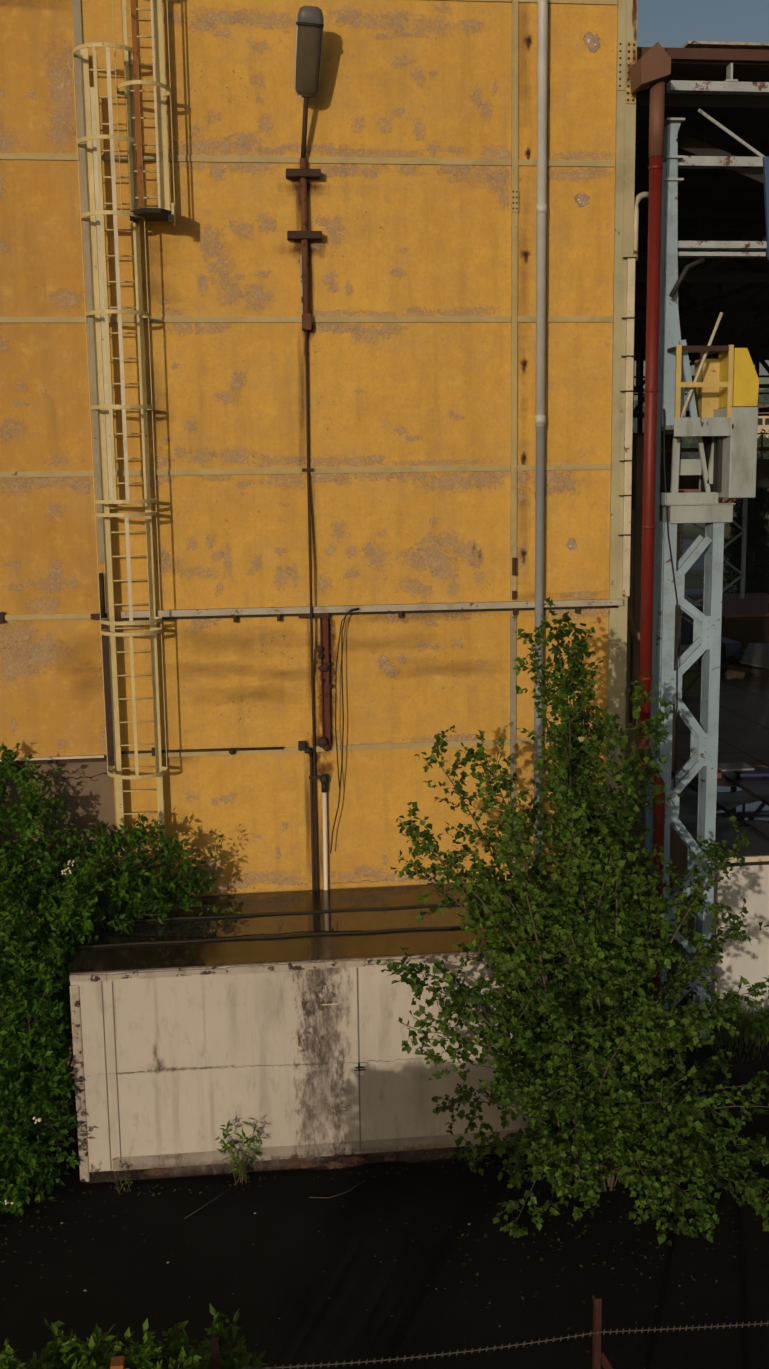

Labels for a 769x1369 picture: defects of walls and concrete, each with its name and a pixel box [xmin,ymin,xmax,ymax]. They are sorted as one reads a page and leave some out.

spalling [583,31,600,53]
peeling [198,214,276,310]
peeling [319,507,483,597]
rust [299,613,336,780]
damp [298,968,341,1138]